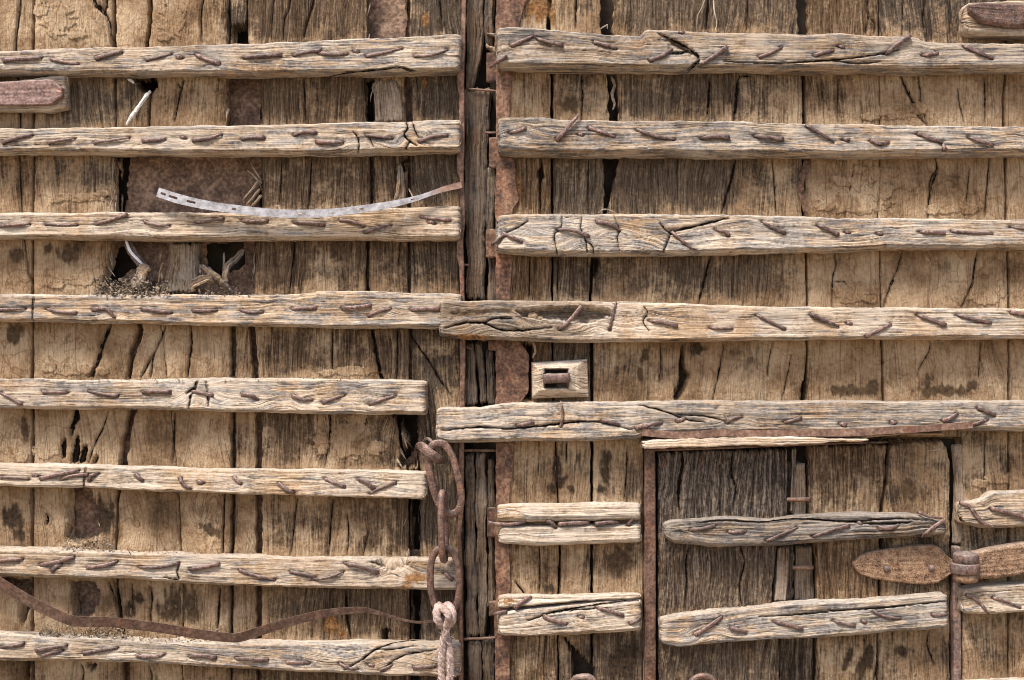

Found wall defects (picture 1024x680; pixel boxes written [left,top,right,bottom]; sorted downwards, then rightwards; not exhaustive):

crack [659,33,886,121]
crack [447,317,543,331]
crack [89,326,111,377]
crack [61,410,108,487]
rust [400,571,427,589]